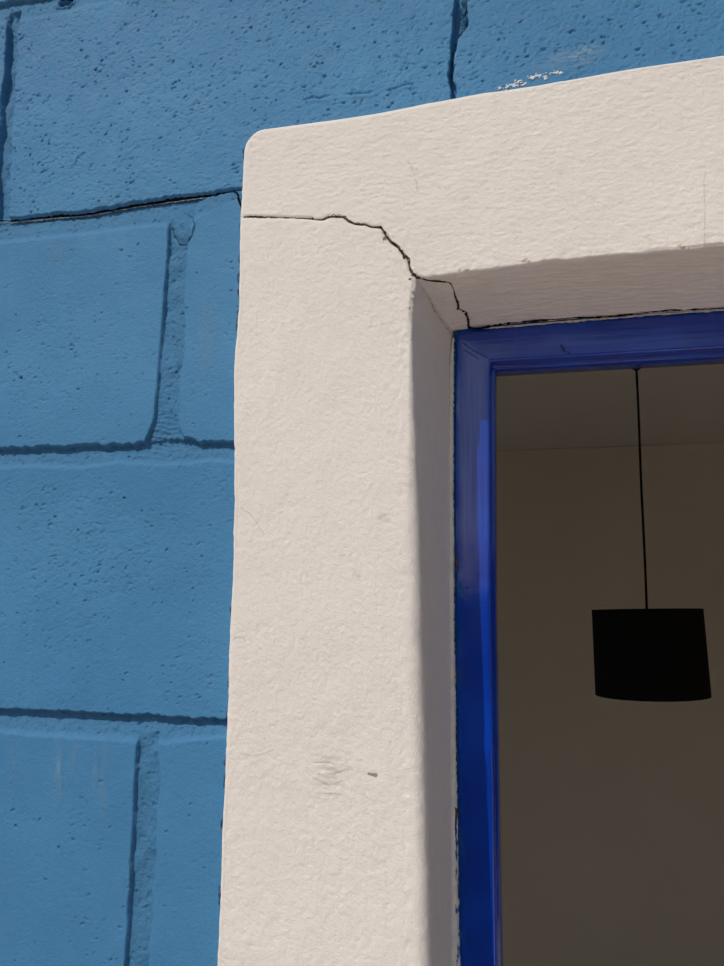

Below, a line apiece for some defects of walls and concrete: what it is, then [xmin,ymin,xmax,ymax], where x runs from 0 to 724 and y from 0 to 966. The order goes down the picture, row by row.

crack [450,0,468,84]
crack [0,191,242,223]
crack [234,255,242,331]
crack [239,214,724,966]